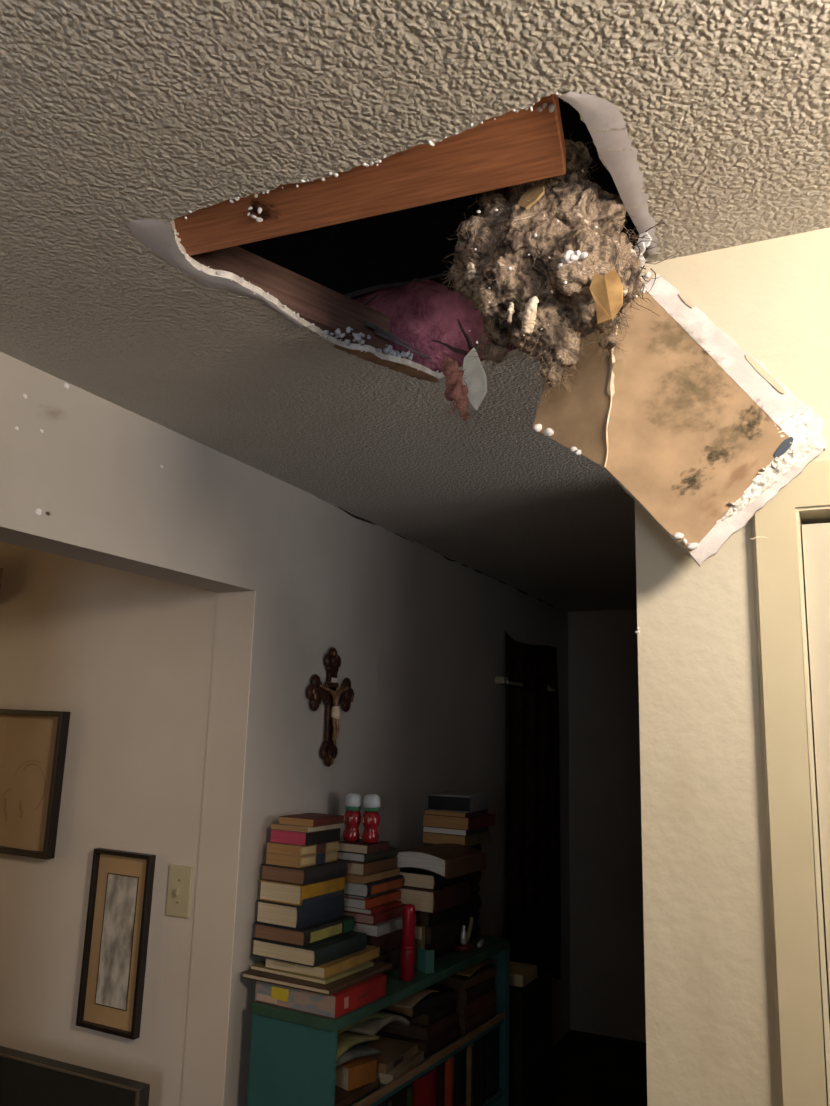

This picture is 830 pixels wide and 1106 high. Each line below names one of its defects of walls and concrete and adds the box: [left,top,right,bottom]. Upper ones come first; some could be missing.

peeling [549,244,588,269]
peeling [533,424,554,437]
mould [736,407,760,439]
mould [706,446,729,462]
peeling [673,532,699,550]